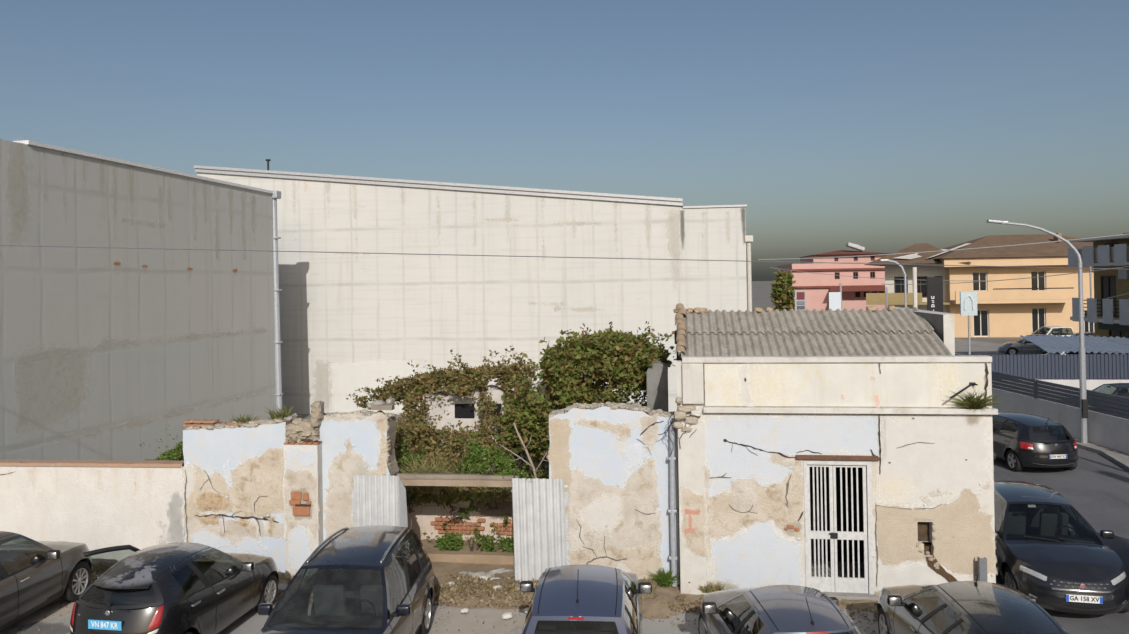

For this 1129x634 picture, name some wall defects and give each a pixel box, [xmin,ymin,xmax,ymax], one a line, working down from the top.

crack [184,470,279,542]
peeling [182,414,388,547]
crack [576,519,627,564]
peeling [547,415,662,579]
crack [709,441,769,514]
peeling [681,452,804,558]
crack [785,450,821,508]
peeling [872,487,997,582]